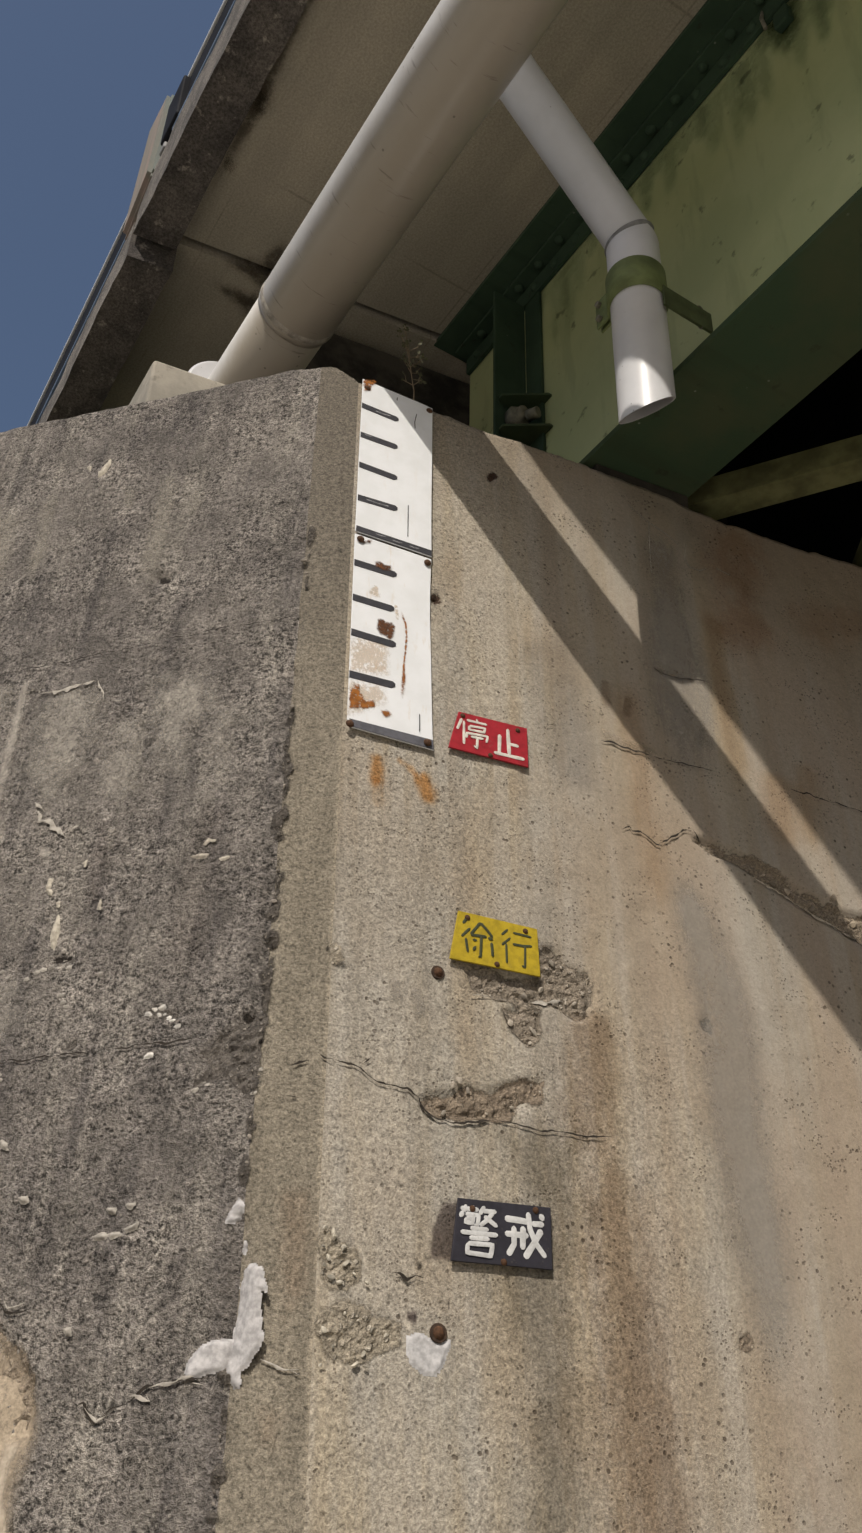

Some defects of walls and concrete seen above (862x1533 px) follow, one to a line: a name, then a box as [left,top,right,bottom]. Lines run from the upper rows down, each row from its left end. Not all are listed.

crack [592,825,699,845]
spalling [693,838,862,946]
spalling [466,945,593,1047]
crack [262,1039,610,1138]
spalling [420,1077,544,1123]